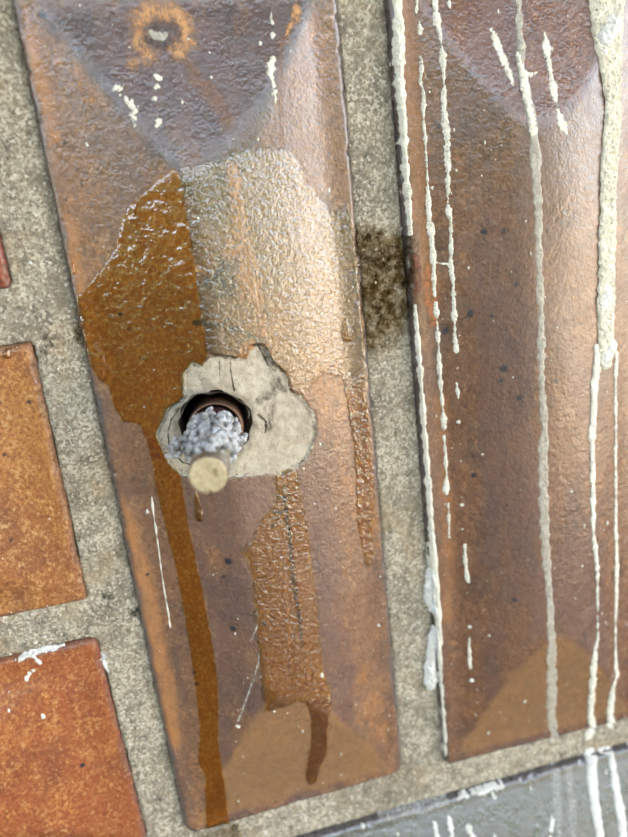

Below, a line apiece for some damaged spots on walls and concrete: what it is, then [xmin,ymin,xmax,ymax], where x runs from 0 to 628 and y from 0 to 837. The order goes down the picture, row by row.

corrosion [133,3,195,59]
corrosion [223,163,271,359]
damp [389,0,413,236]
damp [589,0,626,370]
spalling [155,343,317,478]
damp [361,233,447,756]
damp [515,0,558,745]
damp [432,815,454,837]
damp [583,746,627,837]